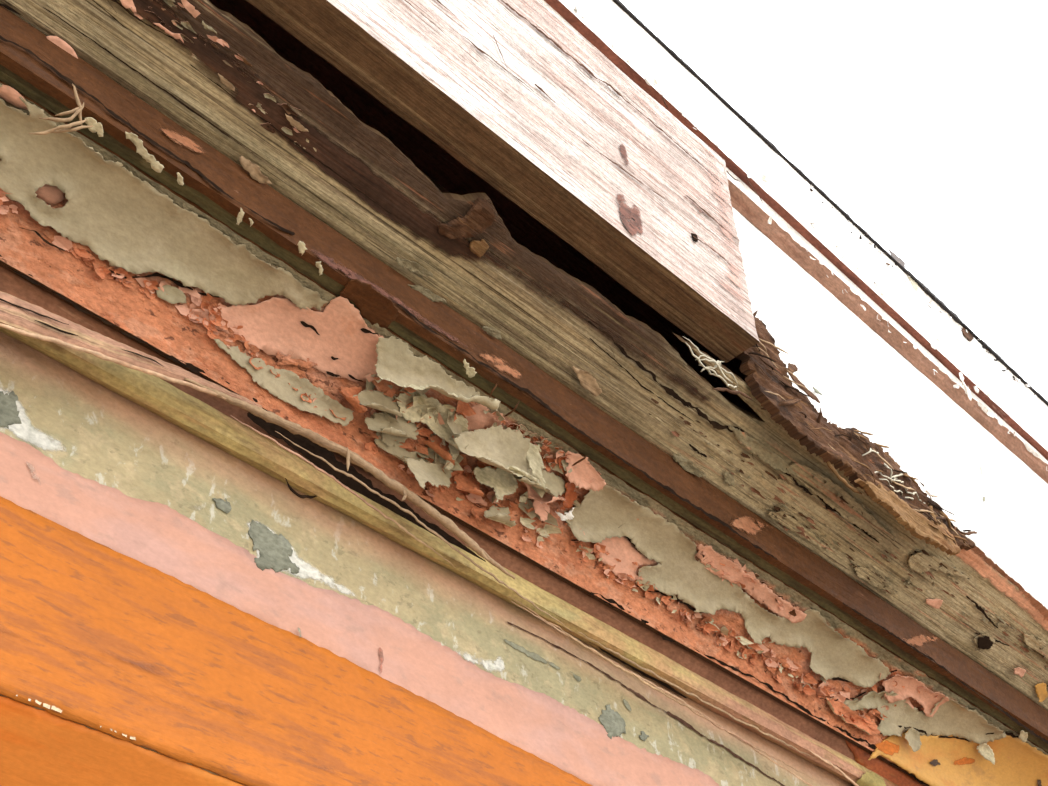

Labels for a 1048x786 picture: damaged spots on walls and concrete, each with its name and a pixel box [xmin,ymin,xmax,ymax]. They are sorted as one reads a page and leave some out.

peeling [739,167,791,208]
peeling [822,201,924,290]
crack [0,255,231,385]
peeling [0,84,606,549]
peeling [928,297,1035,395]
peeling [952,372,1020,436]
peeling [248,519,300,574]
peeling [649,398,1048,677]
peeling [565,485,1006,765]